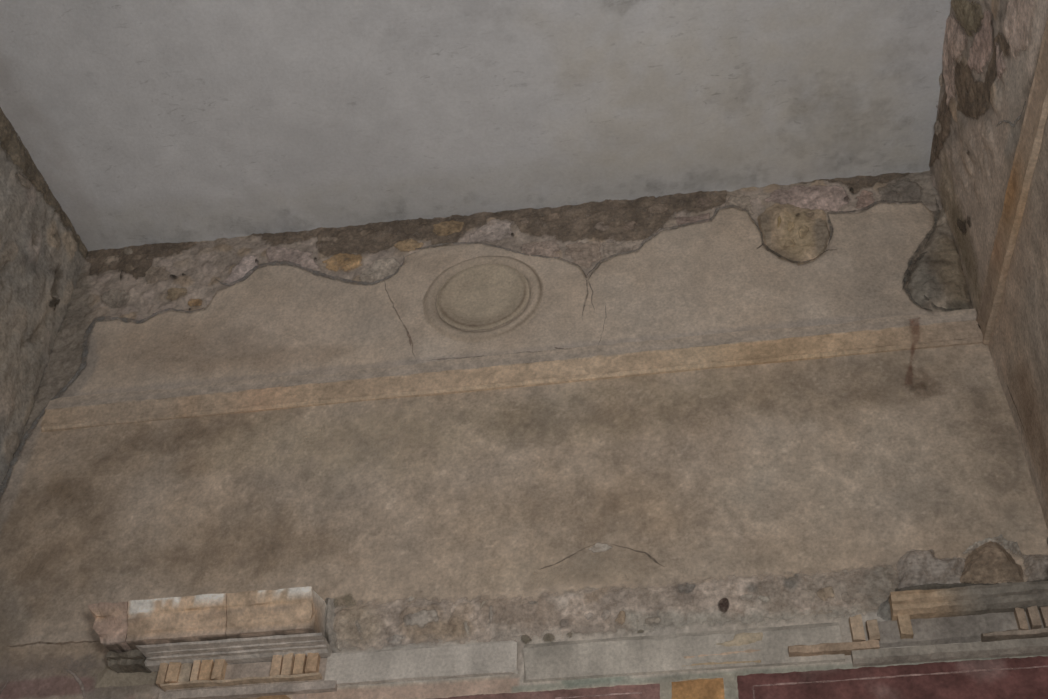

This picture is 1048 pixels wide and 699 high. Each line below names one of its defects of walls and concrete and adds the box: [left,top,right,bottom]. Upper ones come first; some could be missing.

spalling [951,0,984,37]
spalling [0,33,1010,467]
crack [422,205,781,342]
crack [384,280,443,361]
crack [538,542,664,570]
spalling [718,598,729,613]
spalling [521,633,554,643]